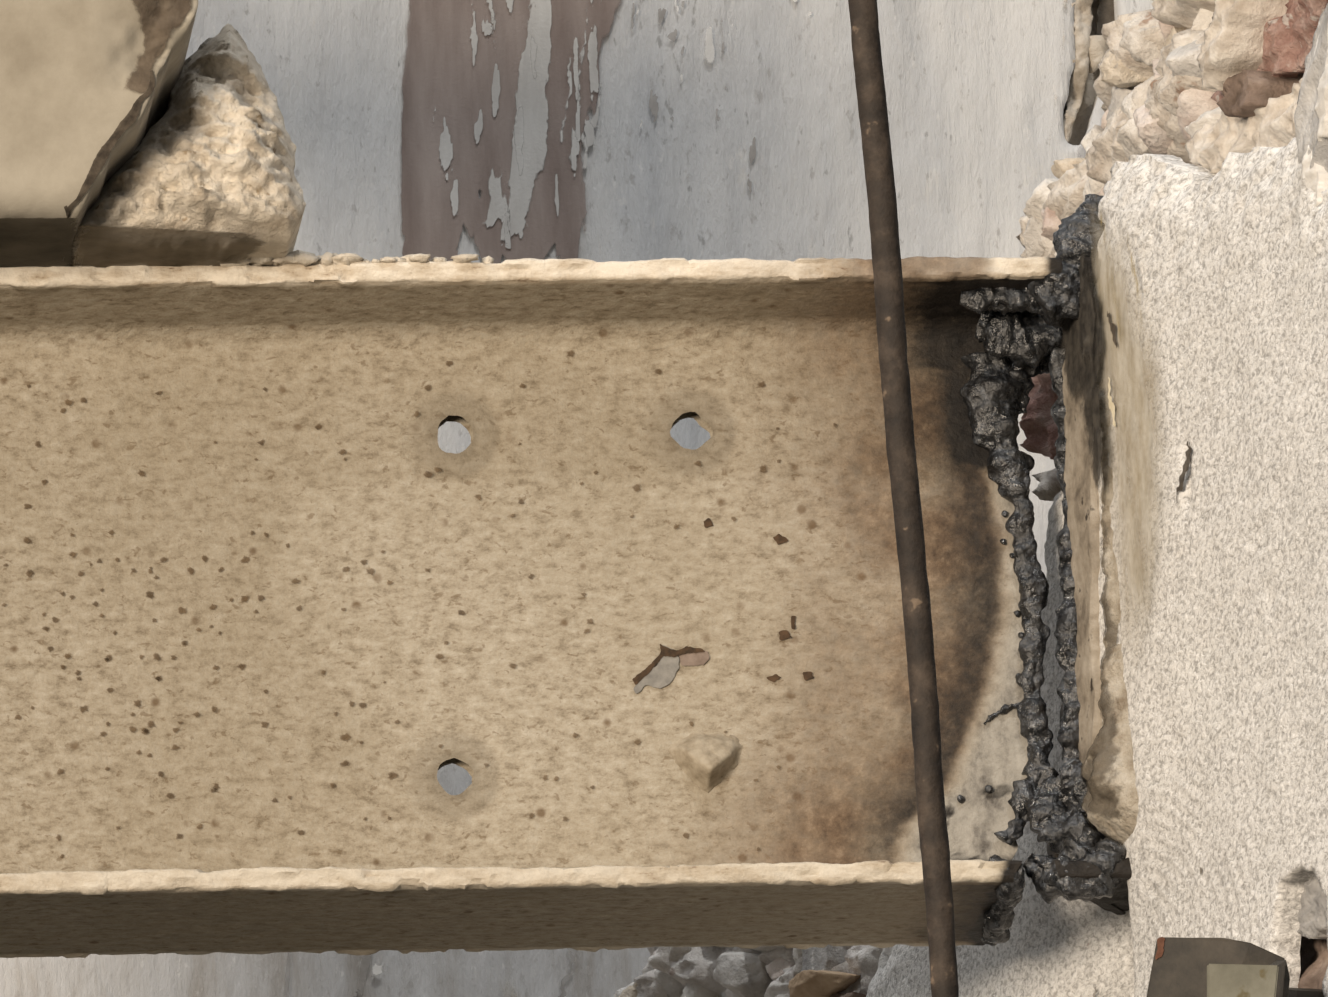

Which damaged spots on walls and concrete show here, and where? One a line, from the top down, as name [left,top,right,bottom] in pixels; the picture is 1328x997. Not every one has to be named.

flaking render [1016,0,1328,258]
flaking render [1019,373,1061,501]
peeling [632,644,709,693]
flaking render [613,945,883,997]
rust [1155,937,1165,960]